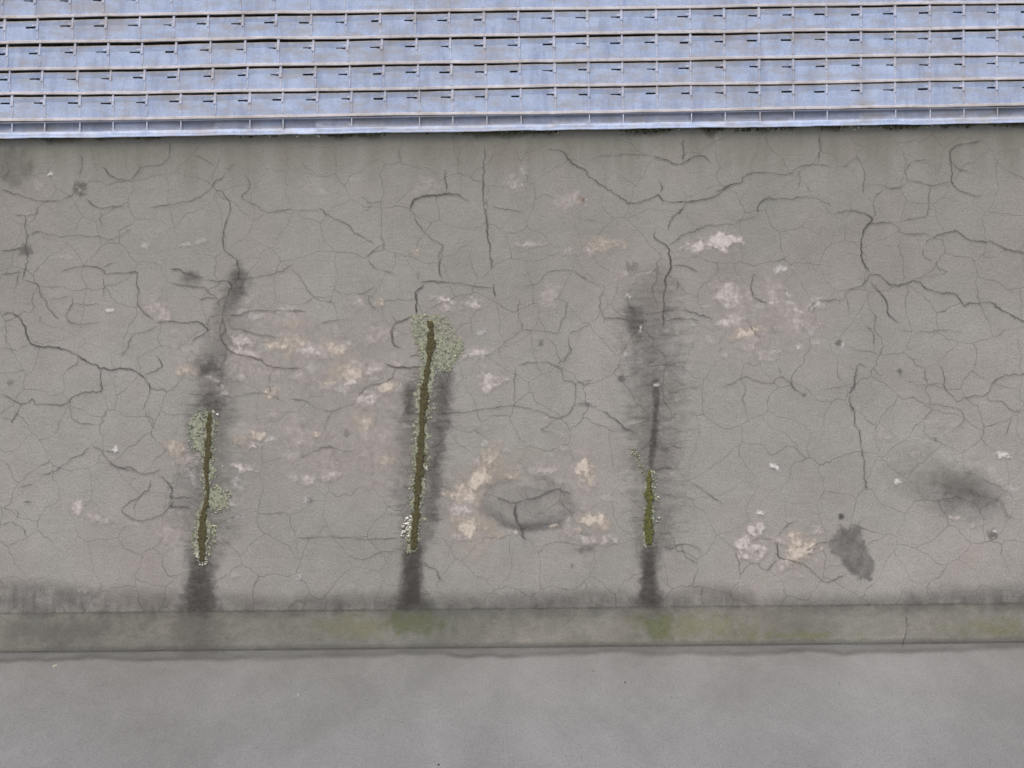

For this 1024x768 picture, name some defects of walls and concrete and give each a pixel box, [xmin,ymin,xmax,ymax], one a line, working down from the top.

crack [411,185,460,205]
crack [654,184,731,230]
crack [13,313,162,405]
crack [95,266,295,369]
crack [392,281,430,369]
crack [653,235,710,325]
crack [859,212,1024,321]
peeling [734,511,824,571]